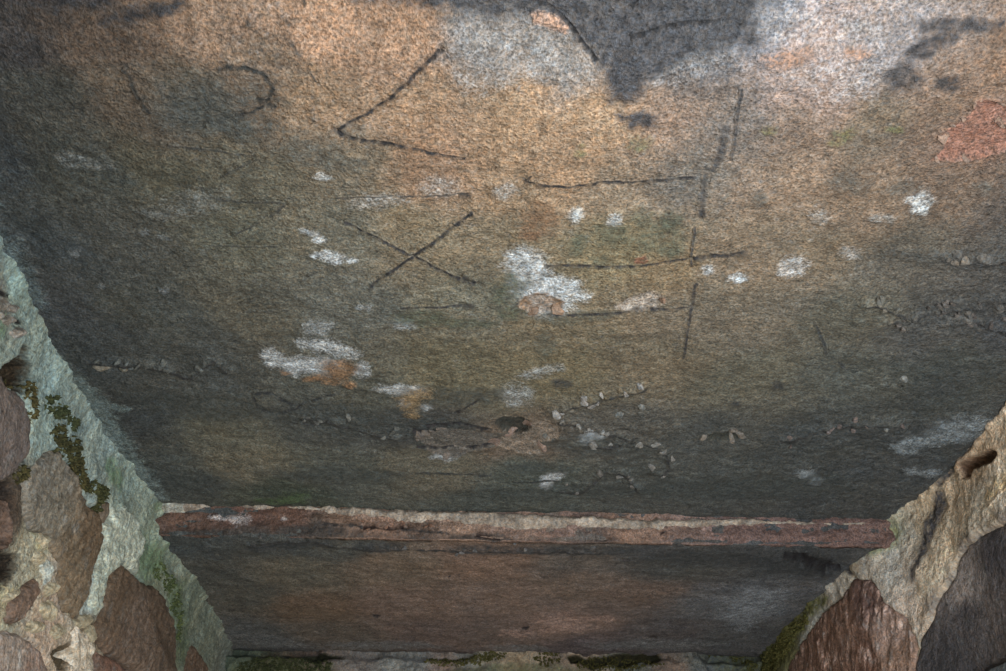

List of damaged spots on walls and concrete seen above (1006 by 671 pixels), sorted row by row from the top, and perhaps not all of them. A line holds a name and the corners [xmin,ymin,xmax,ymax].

water stain [0,0,201,34]
water stain [228,0,1006,134]
water stain [295,224,361,268]
water stain [48,237,873,510]
spalling [414,383,675,478]
water stain [159,509,857,653]